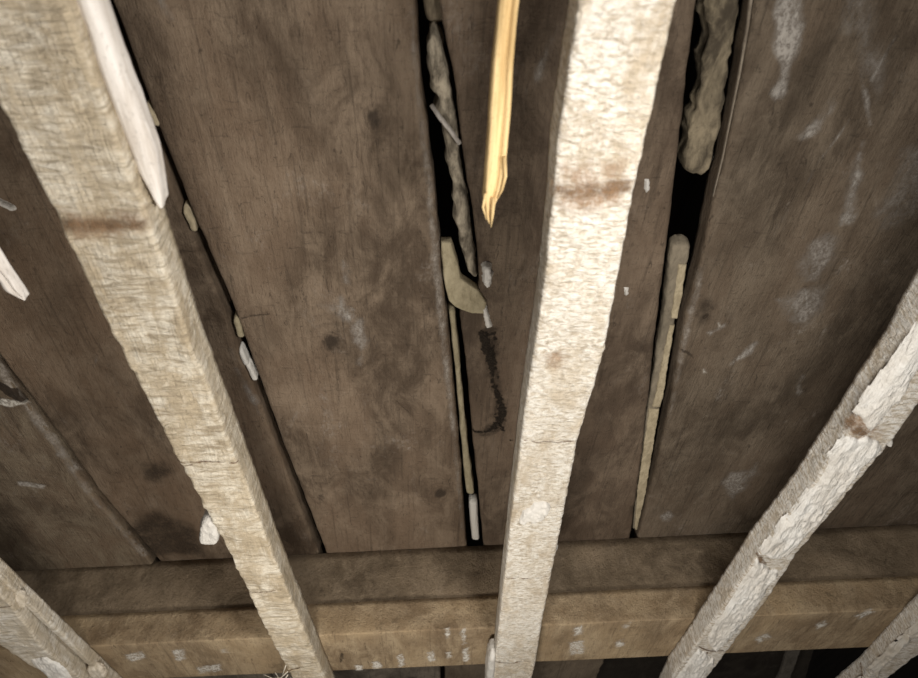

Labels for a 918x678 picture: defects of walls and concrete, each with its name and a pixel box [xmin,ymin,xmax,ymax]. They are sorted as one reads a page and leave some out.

corrosion [555,182,630,205]
corrosion [844,419,867,436]
peeling [676,322,918,678]